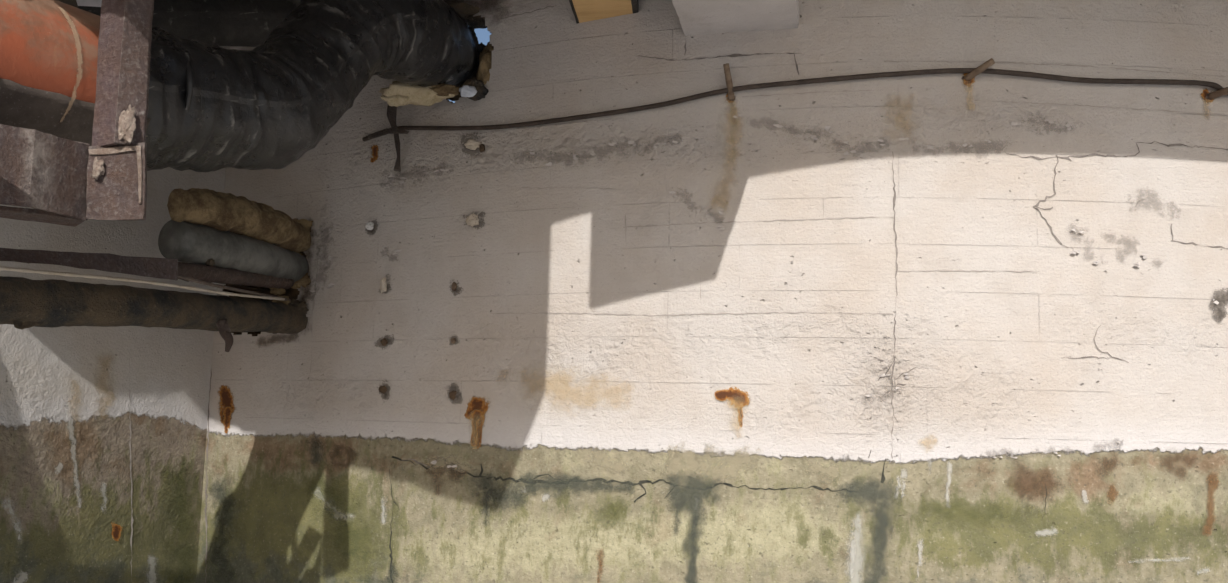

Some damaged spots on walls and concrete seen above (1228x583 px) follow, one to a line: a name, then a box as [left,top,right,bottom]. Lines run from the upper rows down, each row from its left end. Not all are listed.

crack [1006,141,1228,249]
crack [490,151,1039,483]
corrosion [218,385,235,433]
corrosion [464,396,490,449]
corrosion [715,387,750,427]
water stain [210,484,234,583]
water stain [430,468,633,524]
crack [585,478,681,503]
water stain [669,475,718,583]
crack [712,483,846,491]
water stain [839,470,907,583]
corrosion [1203,474,1219,535]